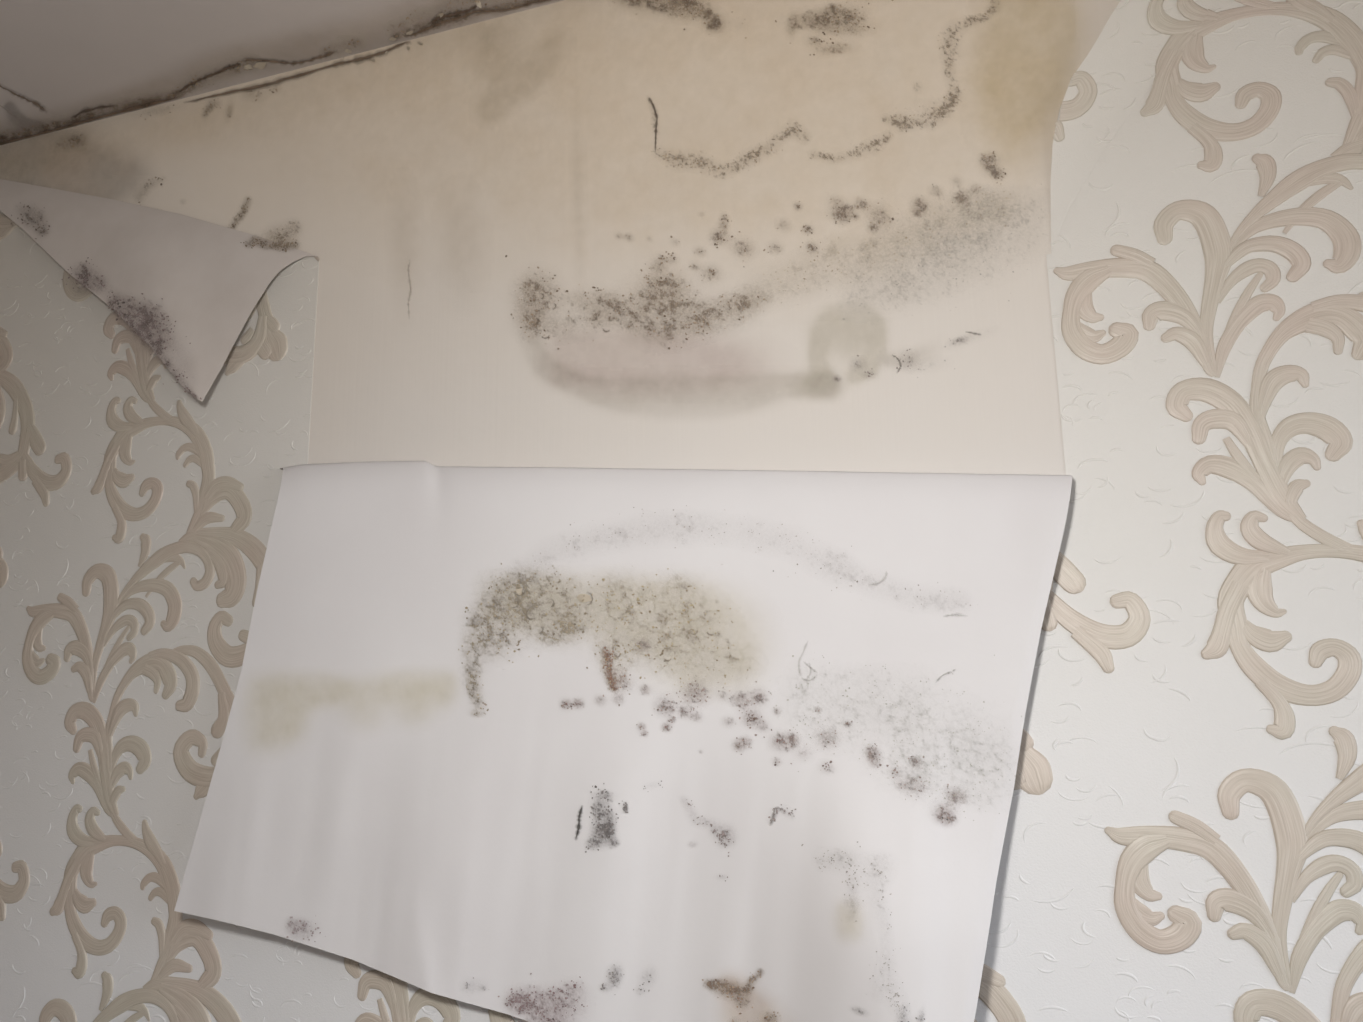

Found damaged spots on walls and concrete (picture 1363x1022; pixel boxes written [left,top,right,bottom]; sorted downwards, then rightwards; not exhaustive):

crack [0,0,549,145]
leakage [614,0,721,35]
leakage [775,2,875,56]
leakage [867,2,999,147]
leakage [231,198,298,252]
leakage [510,151,1030,350]
leakage [61,257,201,399]
leakage [458,553,853,772]
leakage [585,783,628,853]
leakage [859,681,1011,823]
leakage [465,973,584,1022]
leakage [702,970,778,1022]